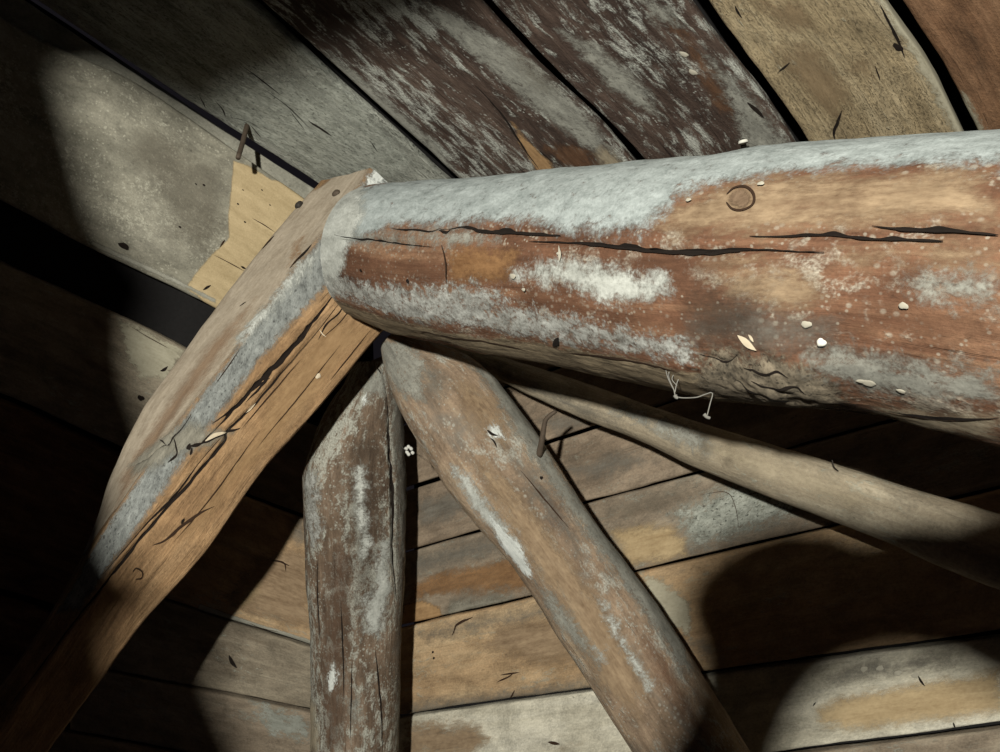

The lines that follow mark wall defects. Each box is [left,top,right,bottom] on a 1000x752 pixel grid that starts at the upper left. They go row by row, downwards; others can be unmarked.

mould [199,50,460,185]
leakage [426,3,610,167]
mould [560,30,655,115]
leakage [639,0,786,147]
crack [1,297,368,716]
leakage [57,238,326,613]